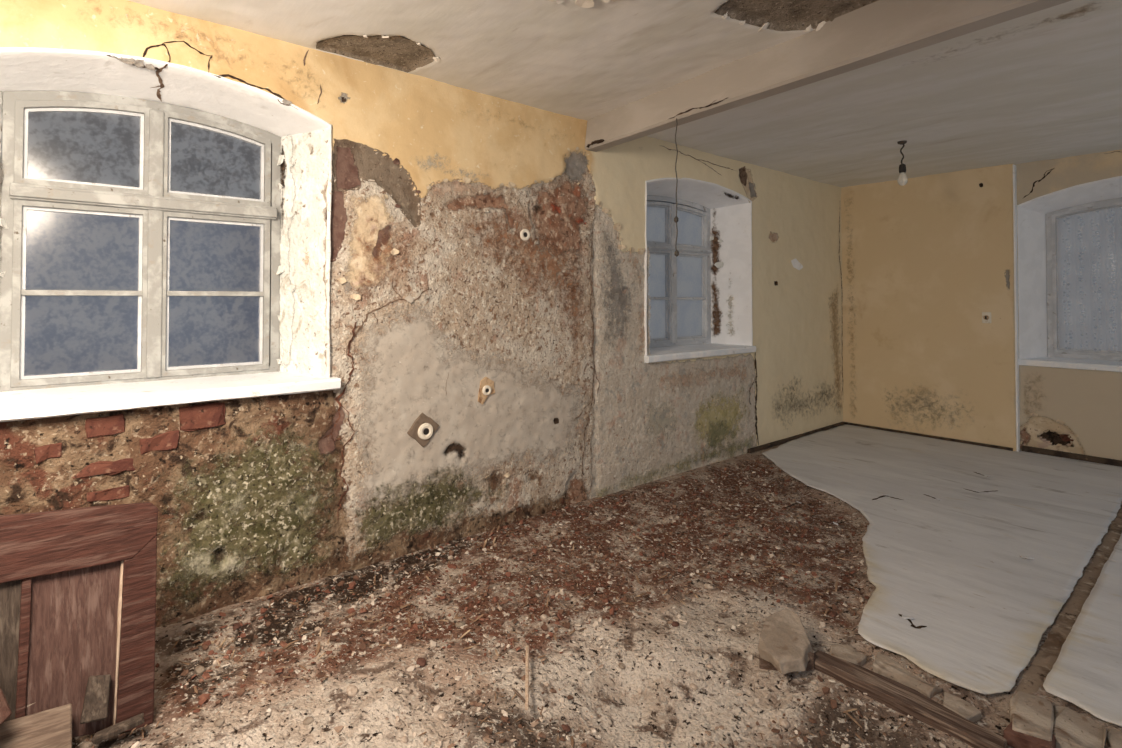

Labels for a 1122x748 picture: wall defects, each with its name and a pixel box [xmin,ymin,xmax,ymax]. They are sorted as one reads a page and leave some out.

crack [107,41,322,109]
crack [318,279,430,511]
flaking render [0,136,757,628]
leakage [696,395,746,448]
flaking render [1020,412,1085,455]